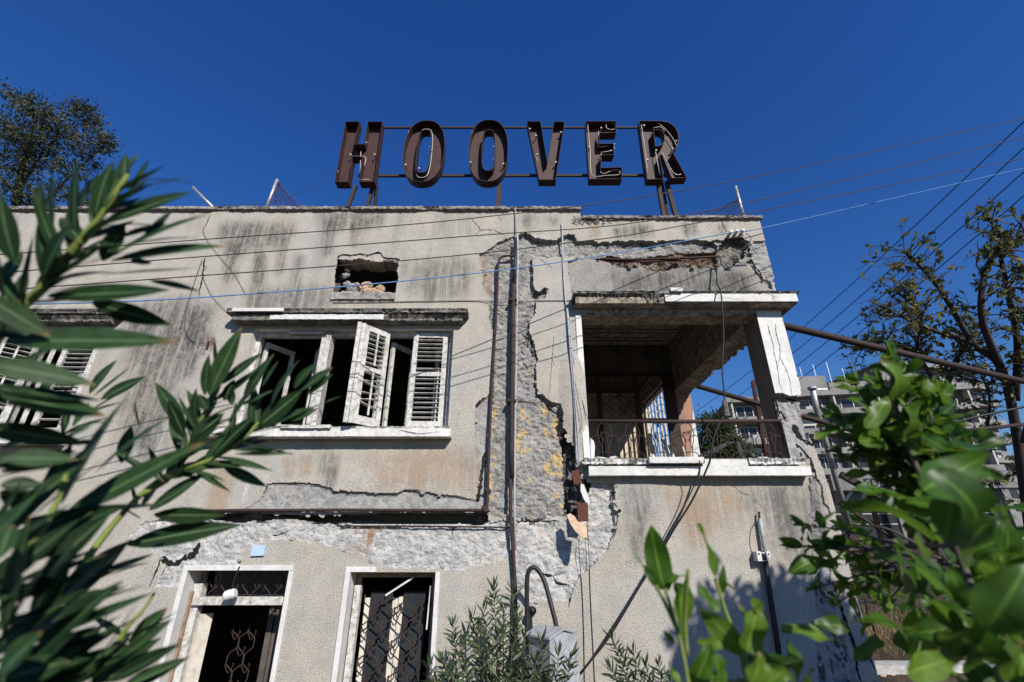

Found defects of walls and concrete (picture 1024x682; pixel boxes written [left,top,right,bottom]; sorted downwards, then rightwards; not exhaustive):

spalling [151,230,775,609]
crack [768,324,838,513]
spalling [128,519,179,540]
crack [149,543,201,586]
crack [213,453,558,536]
crack [840,596,877,682]